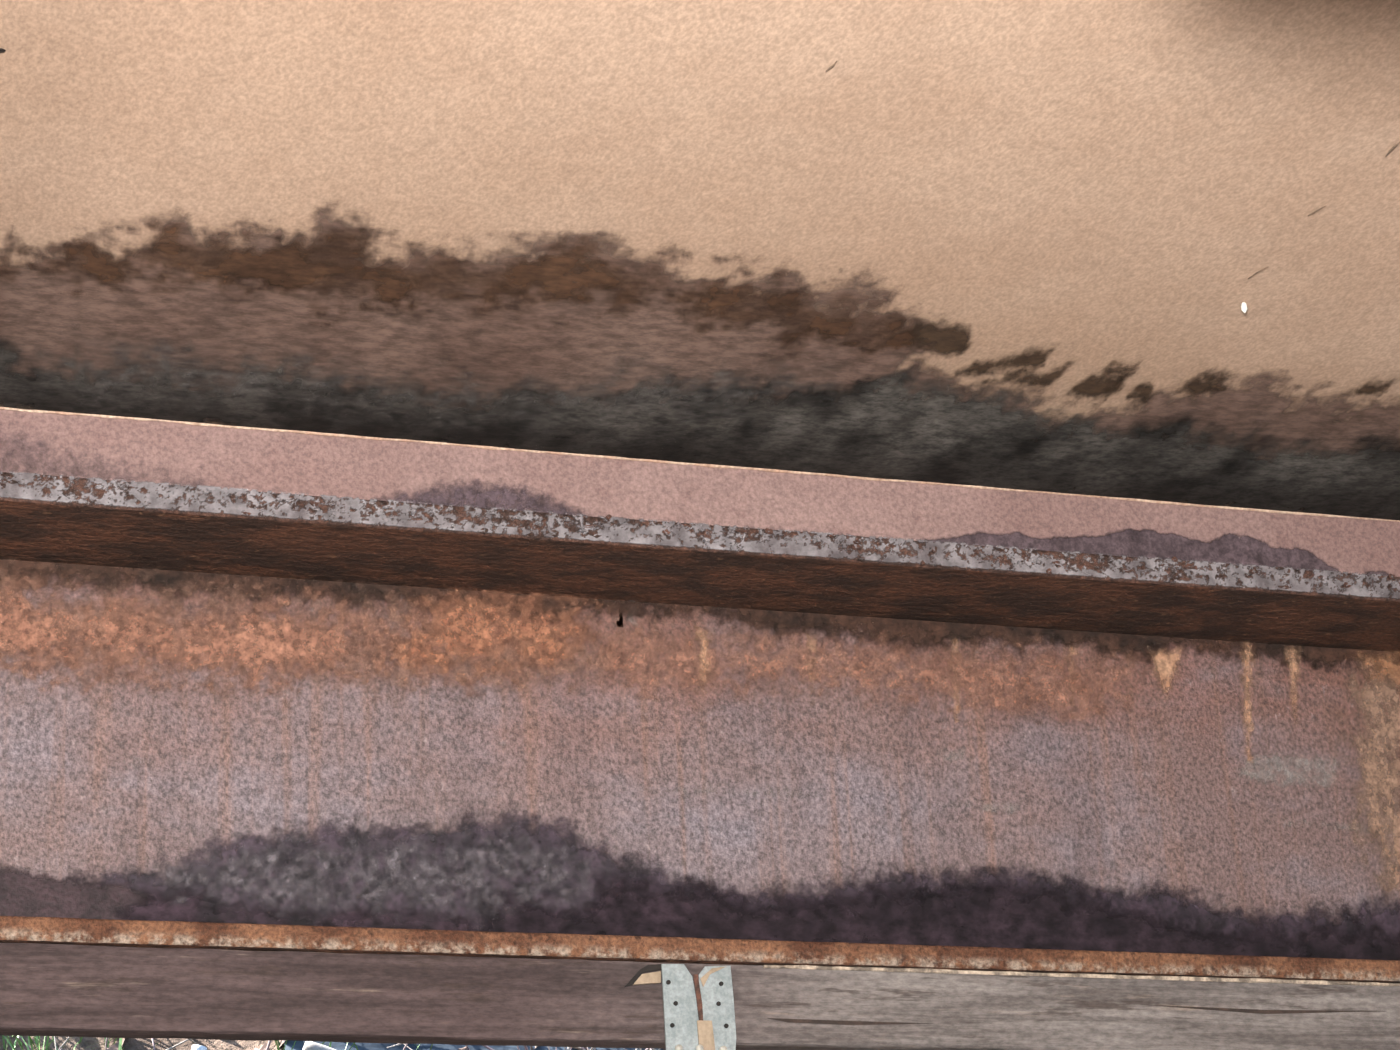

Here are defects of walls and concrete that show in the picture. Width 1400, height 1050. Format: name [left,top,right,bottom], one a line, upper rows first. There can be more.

leakage [0,208,1400,521]
leakage [928,528,1340,572]
rust [0,559,1400,891]
leakage [0,803,1400,960]